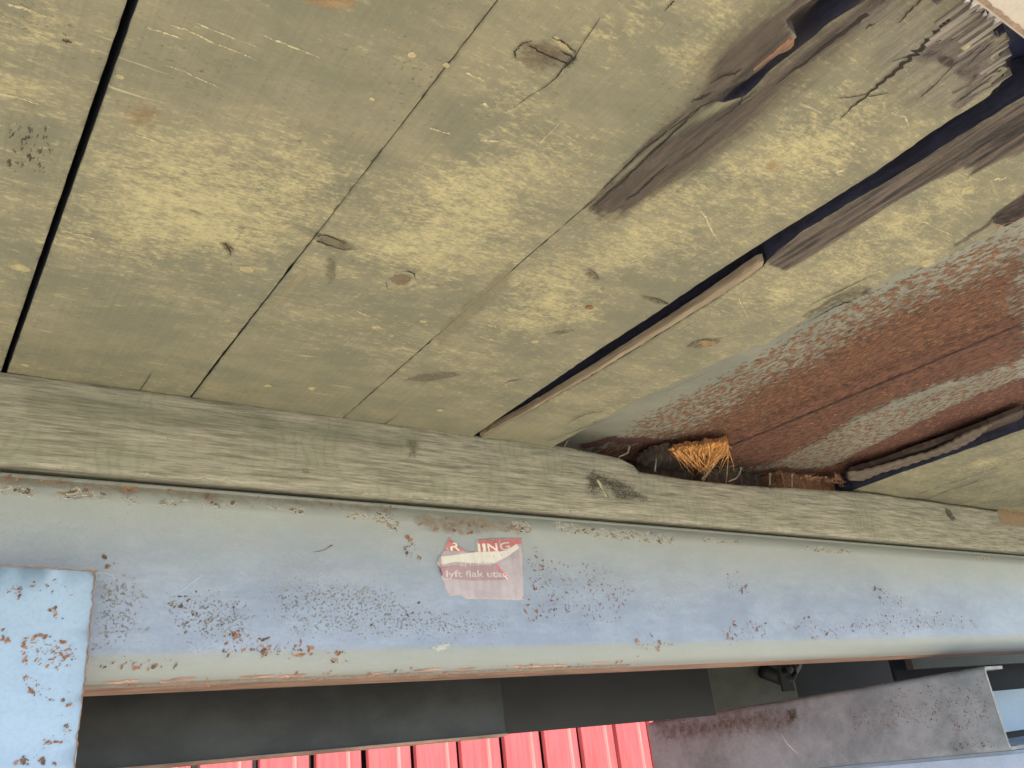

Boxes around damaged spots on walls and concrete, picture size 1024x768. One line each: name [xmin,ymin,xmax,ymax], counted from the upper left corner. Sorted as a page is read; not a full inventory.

crack [513,18,600,108]
crack [840,19,1005,119]
rust [581,223,1024,479]
rust [0,554,510,768]
rust [523,547,631,626]
rust [496,633,673,673]
rust [784,586,978,639]